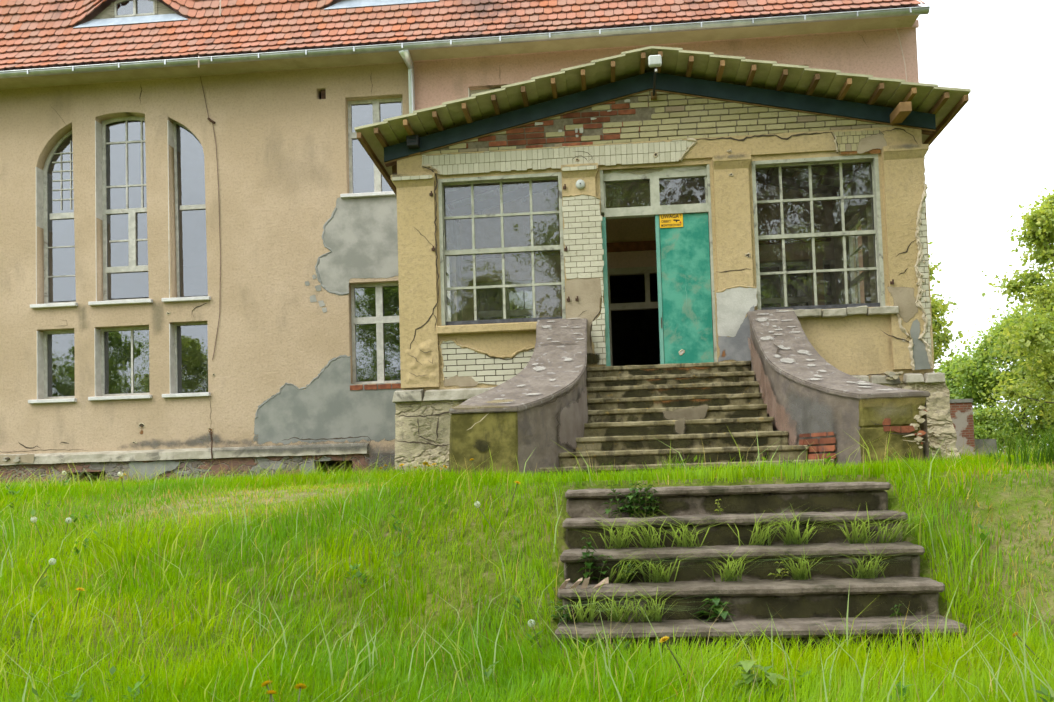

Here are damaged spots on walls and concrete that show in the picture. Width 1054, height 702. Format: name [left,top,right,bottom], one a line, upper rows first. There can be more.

spalling [392,95,704,181]
crack [410,166,439,349]
spalling [438,339,535,387]
crack [485,306,602,360]
peeling [716,285,836,459]
spalling [883,157,935,389]